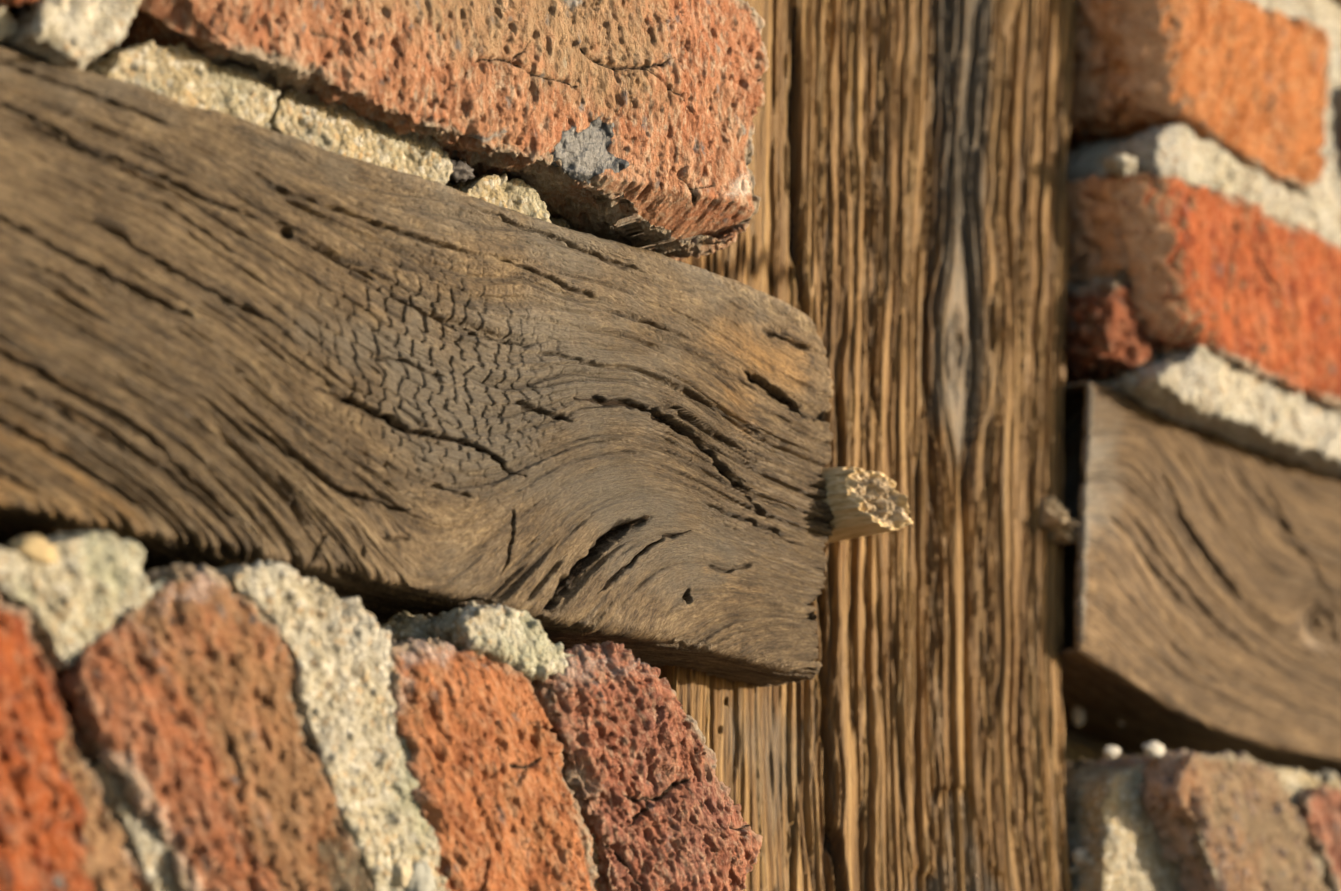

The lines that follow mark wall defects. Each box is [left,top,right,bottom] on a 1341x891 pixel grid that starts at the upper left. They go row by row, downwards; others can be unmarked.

crack [474,42,685,101]
crack [540,515,691,613]
crack [605,779,691,889]